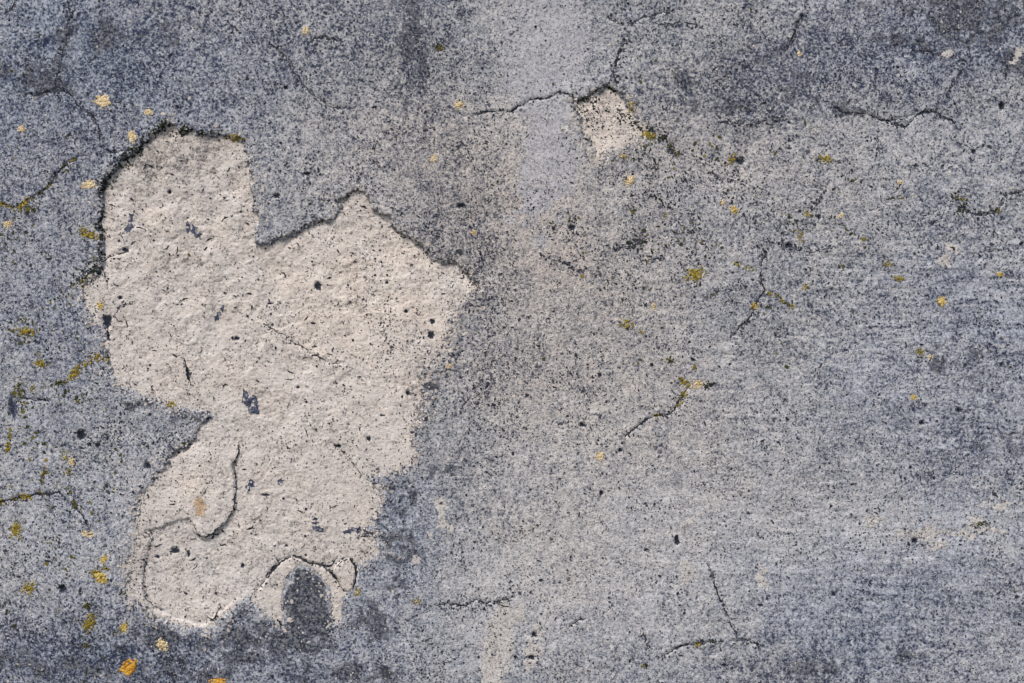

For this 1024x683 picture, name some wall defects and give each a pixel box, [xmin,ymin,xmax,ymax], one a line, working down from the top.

crack [609,11,698,85]
crack [478,91,572,115]
spalling [565,76,655,178]
crack [736,242,828,331]
spalling [71,111,490,651]
crack [625,382,718,437]
crack [707,564,760,650]